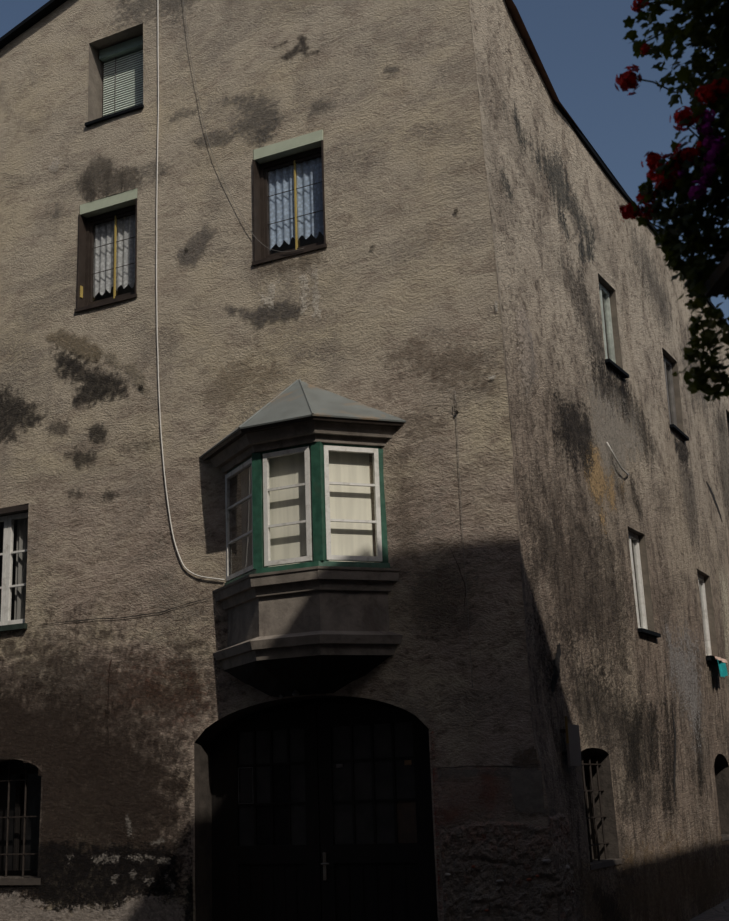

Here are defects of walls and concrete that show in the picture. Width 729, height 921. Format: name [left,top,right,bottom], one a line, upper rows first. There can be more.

leakage [78,156,139,201]
leakage [226,269,321,329]
leakage [717,565,729,676]